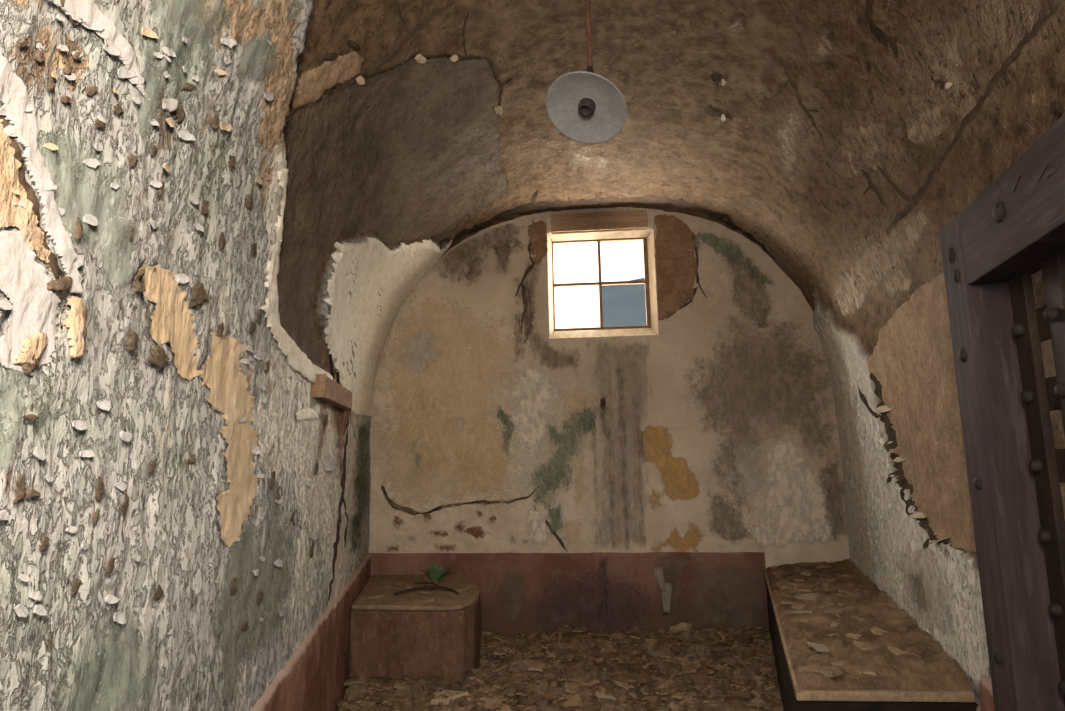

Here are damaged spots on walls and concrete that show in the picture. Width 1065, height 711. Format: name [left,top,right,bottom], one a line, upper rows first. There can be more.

peeling [48,0,200,140]
flaking render [0,45,98,376]
flaking render [125,38,509,552]
flaking render [654,214,699,321]
crack [837,0,1056,308]
peeling [14,574,46,617]
crack [381,485,568,552]
damp [528,506,581,545]
damp [641,425,700,509]
damp [652,522,702,552]
damp [698,254,844,540]
crack [858,372,966,552]